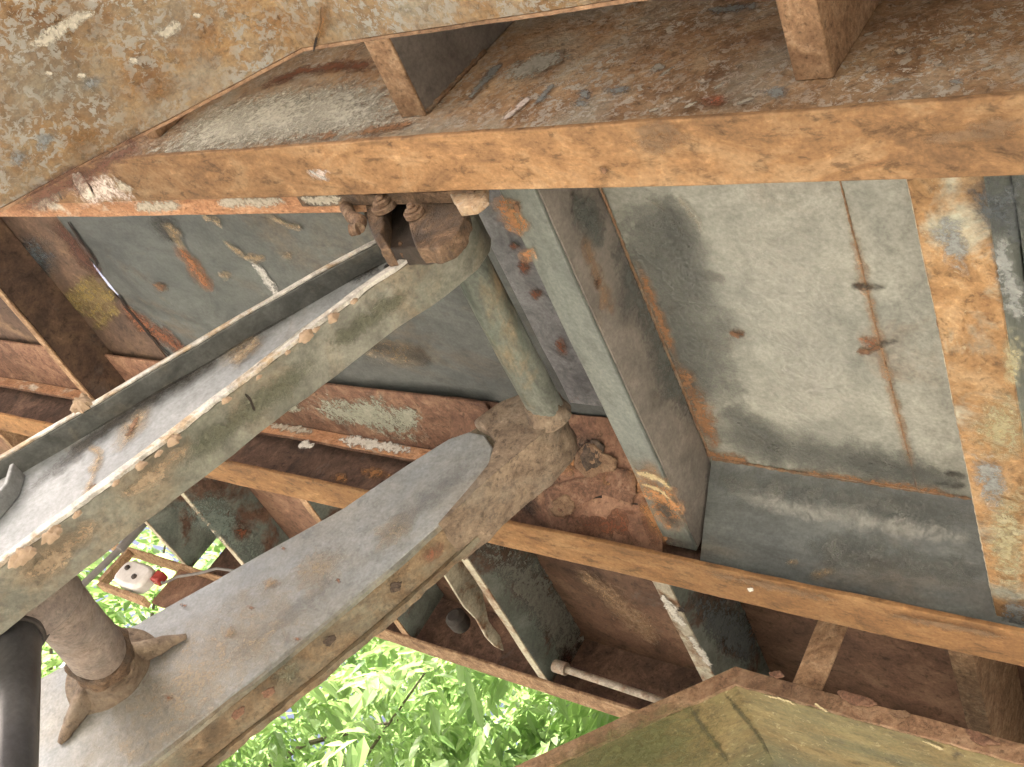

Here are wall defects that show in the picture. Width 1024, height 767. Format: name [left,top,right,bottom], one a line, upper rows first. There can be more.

corrosion [261,59,376,86]
corrosion [359,122,412,135]
corrosion [19,137,147,213]
corrosion [166,224,210,289]
corrosion [496,198,536,273]
corrosion [641,271,674,348]
water stain [612,199,739,416]
corrosion [852,243,912,464]
corrosion [678,368,747,463]
peeling [186,490,264,560]
corrosion [524,438,683,544]
water stain [719,409,951,528]